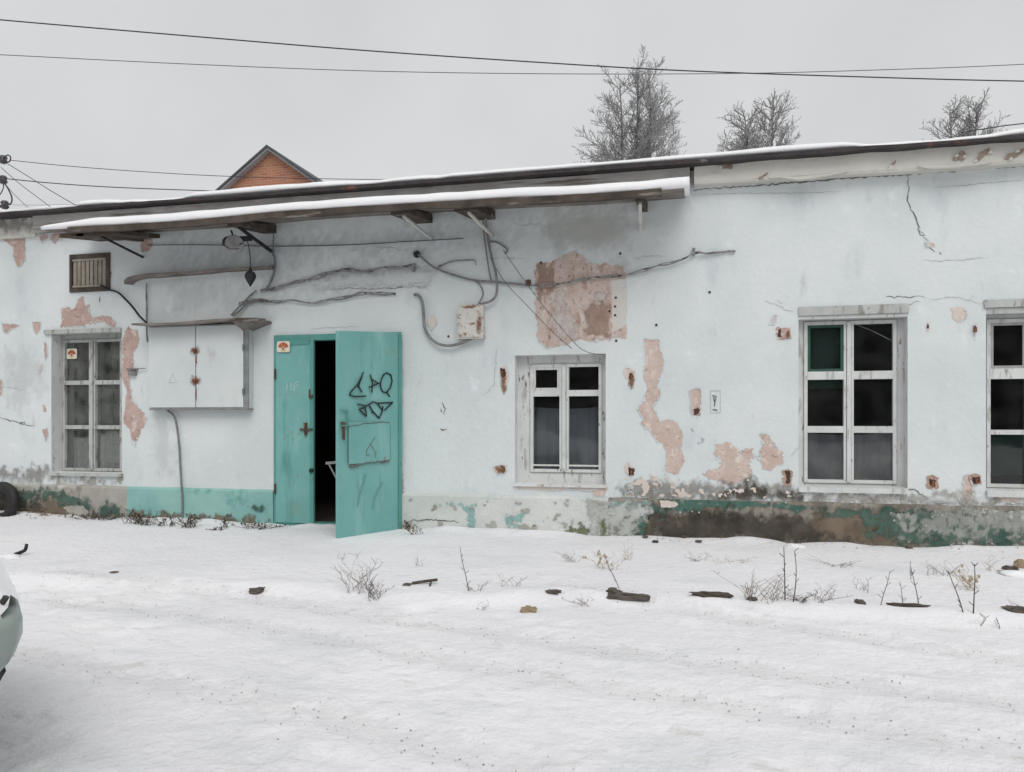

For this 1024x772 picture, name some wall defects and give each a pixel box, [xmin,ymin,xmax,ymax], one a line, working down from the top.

peeling [918,148,993,170]
crack [693,166,1024,262]
peeling [2,238,26,267]
peeling [534,251,627,349]
peeling [60,296,147,447]
peeling [623,338,814,514]
spalling [64,505,89,517]
spalling [485,479,608,532]
damp [586,476,1024,545]